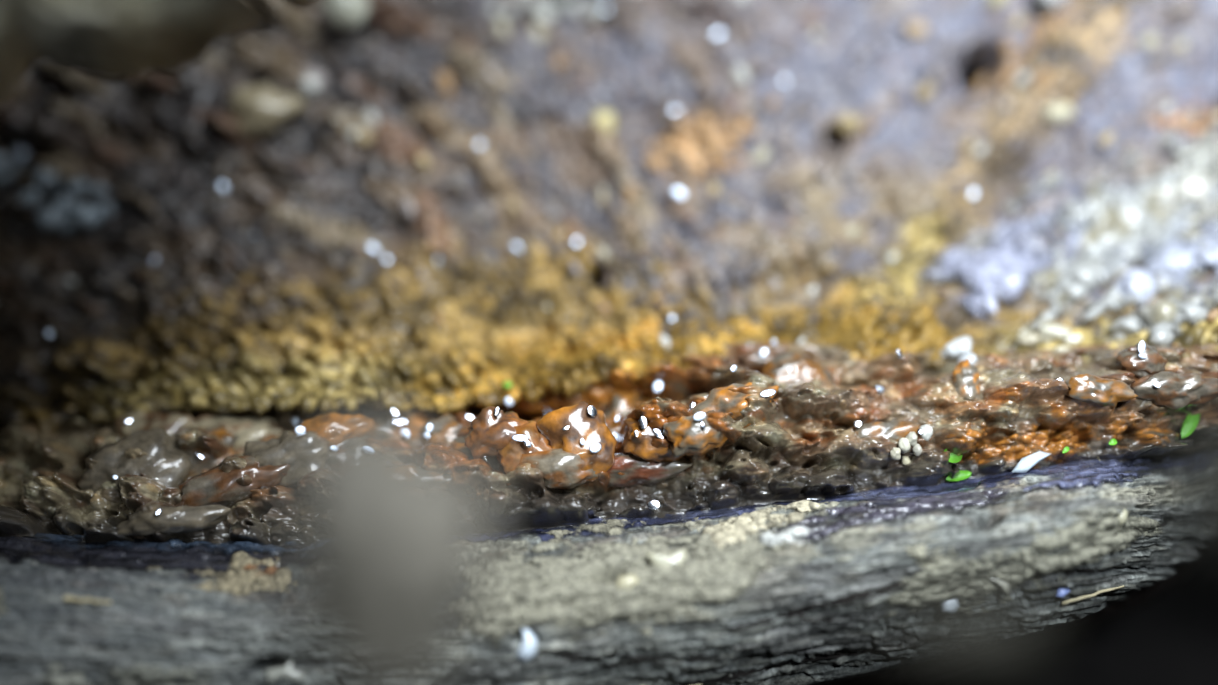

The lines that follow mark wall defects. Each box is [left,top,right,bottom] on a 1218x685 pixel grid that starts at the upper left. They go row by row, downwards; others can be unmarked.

rust [0,0,1218,546]